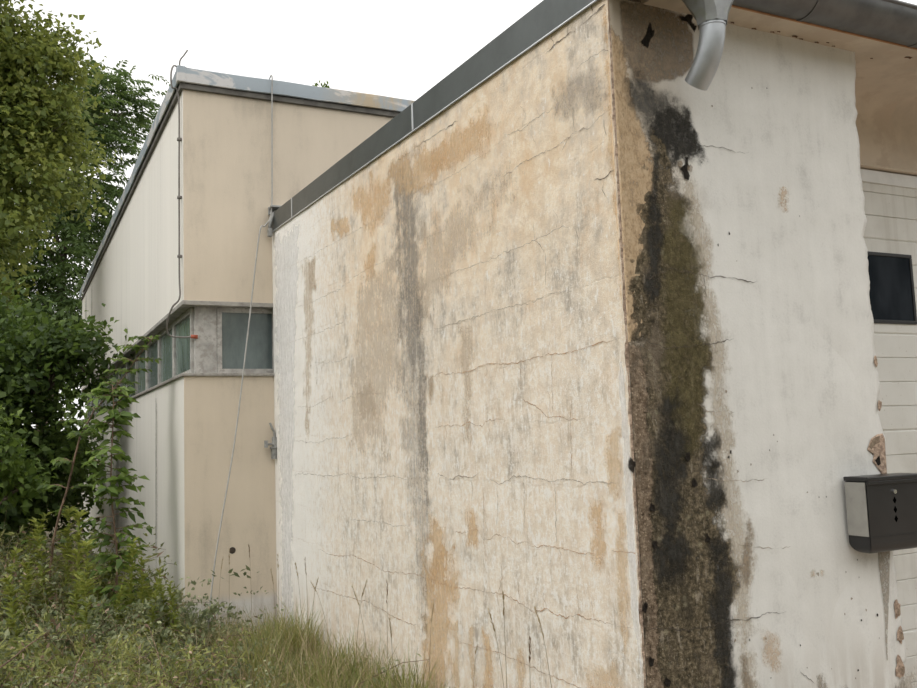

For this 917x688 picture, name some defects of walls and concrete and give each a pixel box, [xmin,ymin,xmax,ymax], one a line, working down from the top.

flaking render [620,1,697,82]
crack [506,106,606,174]
water stain [625,78,704,302]
crack [418,212,578,332]
crack [432,341,610,431]
water stain [652,397,691,588]
water stain [683,183,754,688]
spalling [867,433,887,474]
crack [322,455,635,624]
crack [644,603,779,631]
spalling [894,599,904,644]
spalling [895,655,915,688]